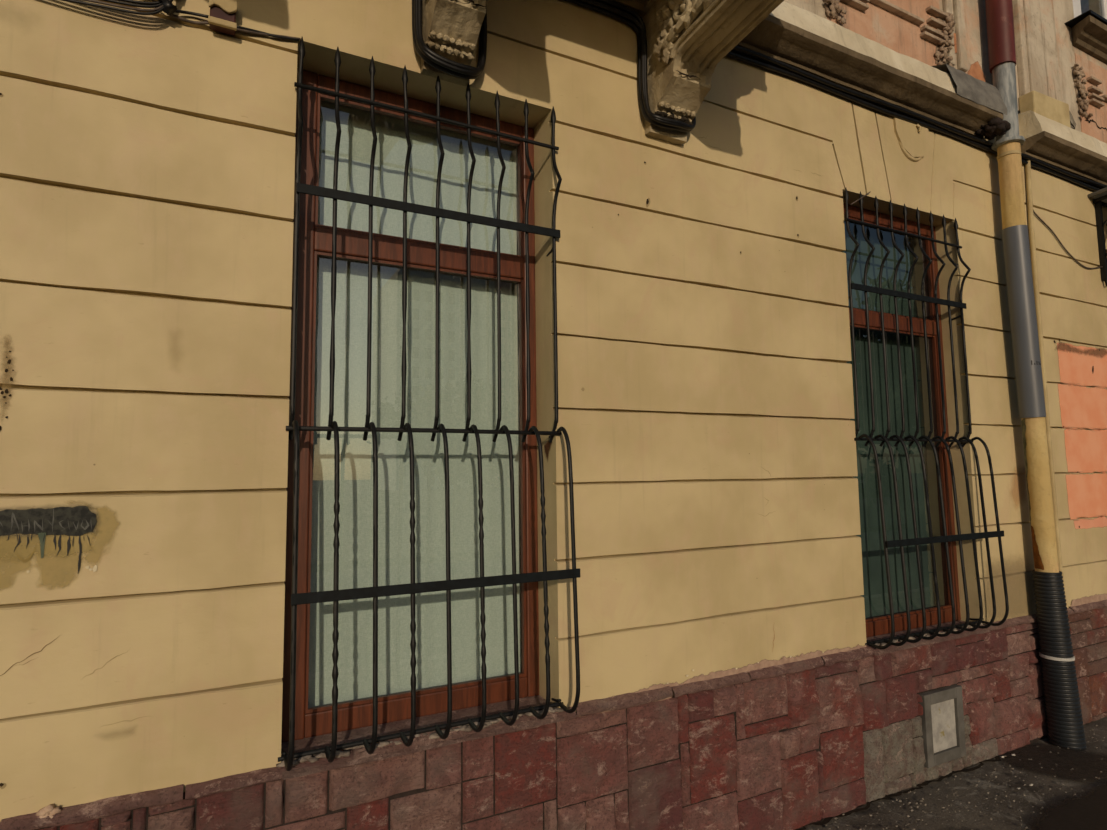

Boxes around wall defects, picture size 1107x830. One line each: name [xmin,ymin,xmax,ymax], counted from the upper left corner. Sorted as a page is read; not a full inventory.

crack [0,637,58,676]